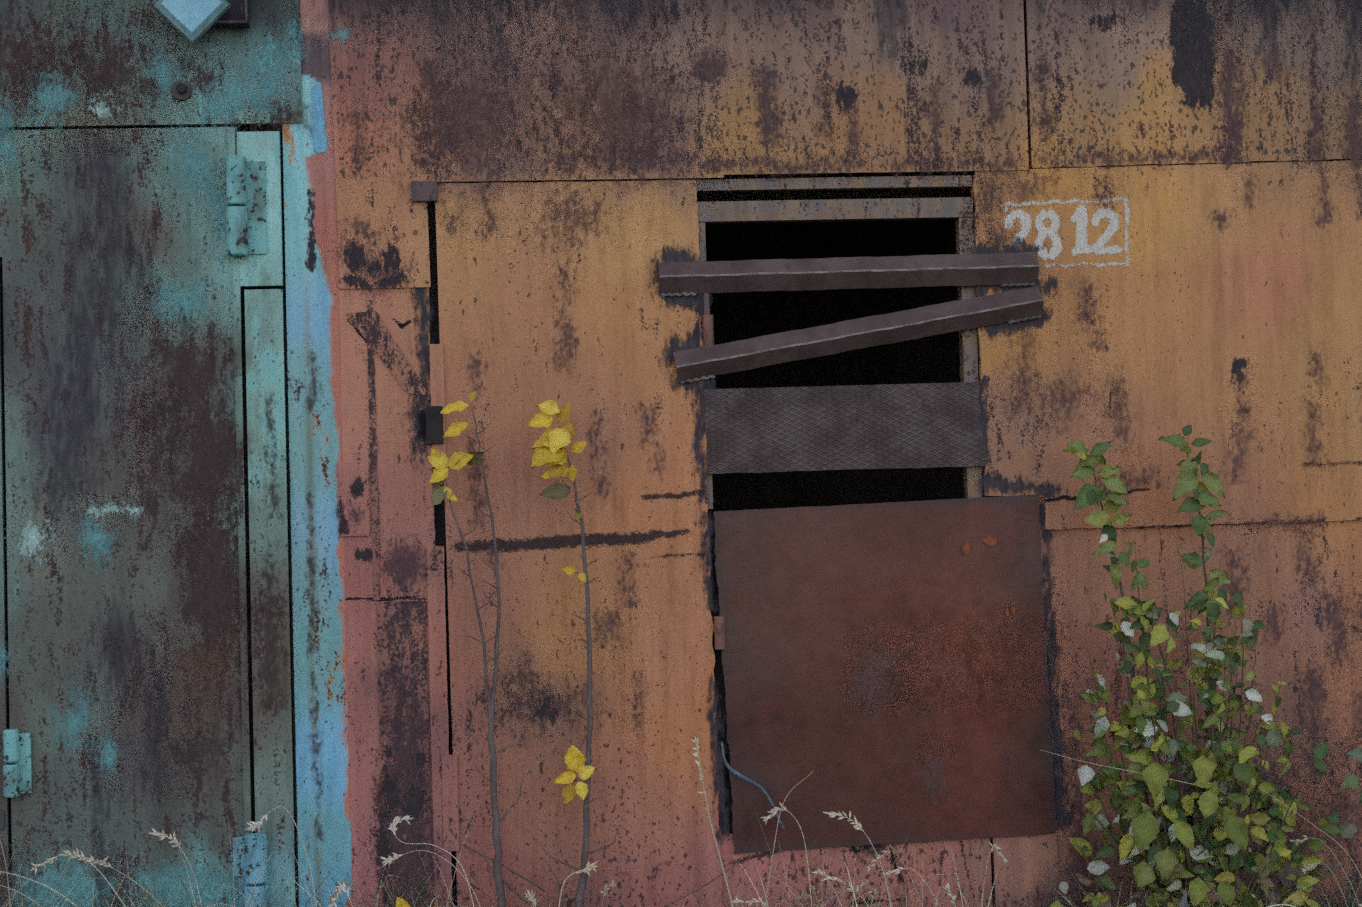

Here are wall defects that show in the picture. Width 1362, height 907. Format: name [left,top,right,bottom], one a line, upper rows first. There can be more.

peeling [33,67,119,124]
corrosion [0,20,224,120]
corrosion [530,54,864,247]
corrosion [891,55,1232,252]
peeling [18,515,57,565]
peeling [78,501,144,571]
corrosion [336,473,367,534]
corrosion [355,535,426,590]
peeling [49,688,117,773]
corrosion [1260,522,1362,862]
corrosion [992,680,1104,907]
peeling [9,853,239,907]